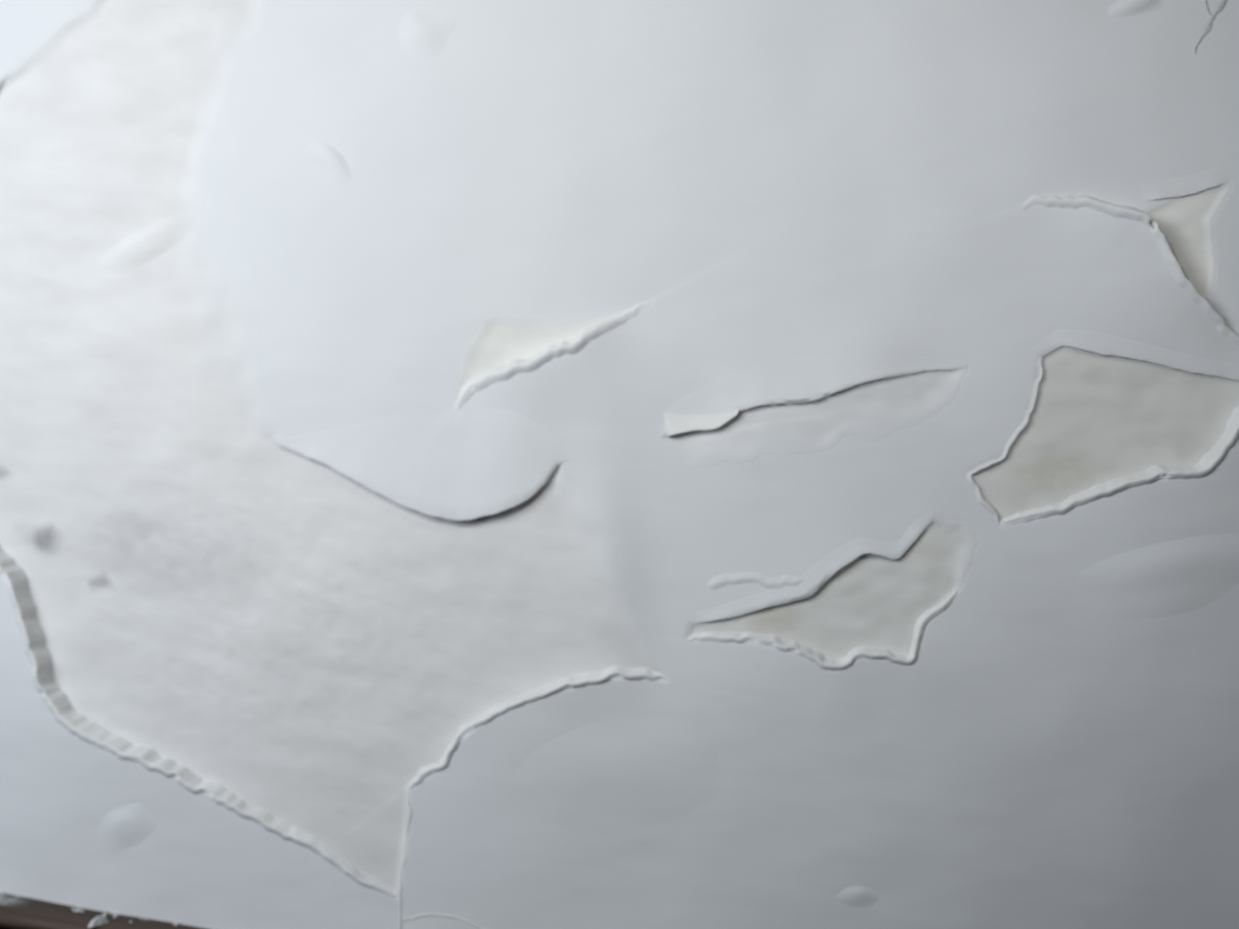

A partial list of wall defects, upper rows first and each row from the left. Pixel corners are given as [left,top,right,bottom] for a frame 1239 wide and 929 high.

peeling [1021,167,1239,345]
peeling [0,0,668,897]
peeling [661,355,969,470]
peeling [966,330,1239,525]
peeling [685,511,978,671]